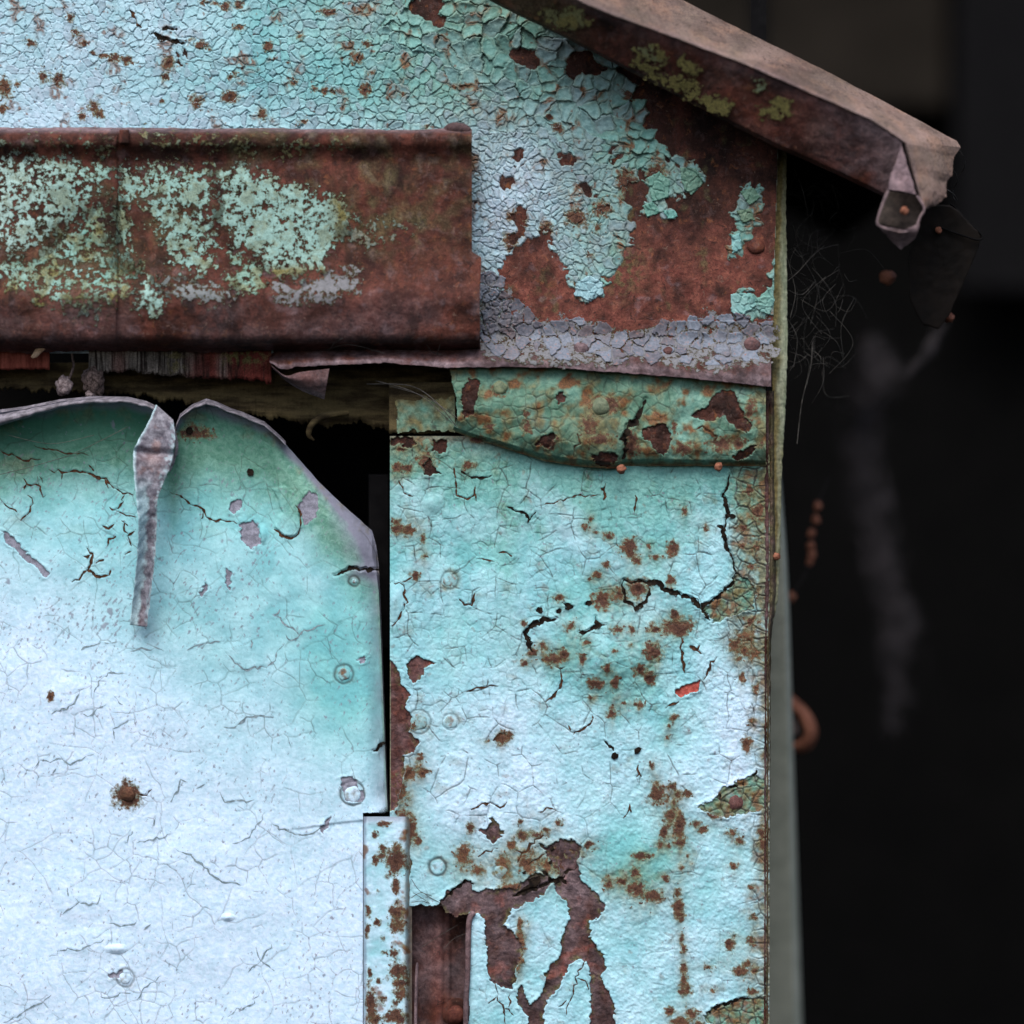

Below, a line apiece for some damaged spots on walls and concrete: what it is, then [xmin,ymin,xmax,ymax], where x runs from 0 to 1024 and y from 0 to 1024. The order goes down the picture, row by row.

crack [129,7,186,44]
peeling [480,51,781,375]
crack [1,445,135,582]
peeling [229,499,262,550]
corrosion [581,517,679,612]
crack [621,474,737,620]
crack [523,601,607,652]
corrosion [586,609,694,718]
peeling [675,680,700,697]
peeling [698,775,767,818]
corrosion [364,752,432,1024]
corrosion [602,761,767,1024]